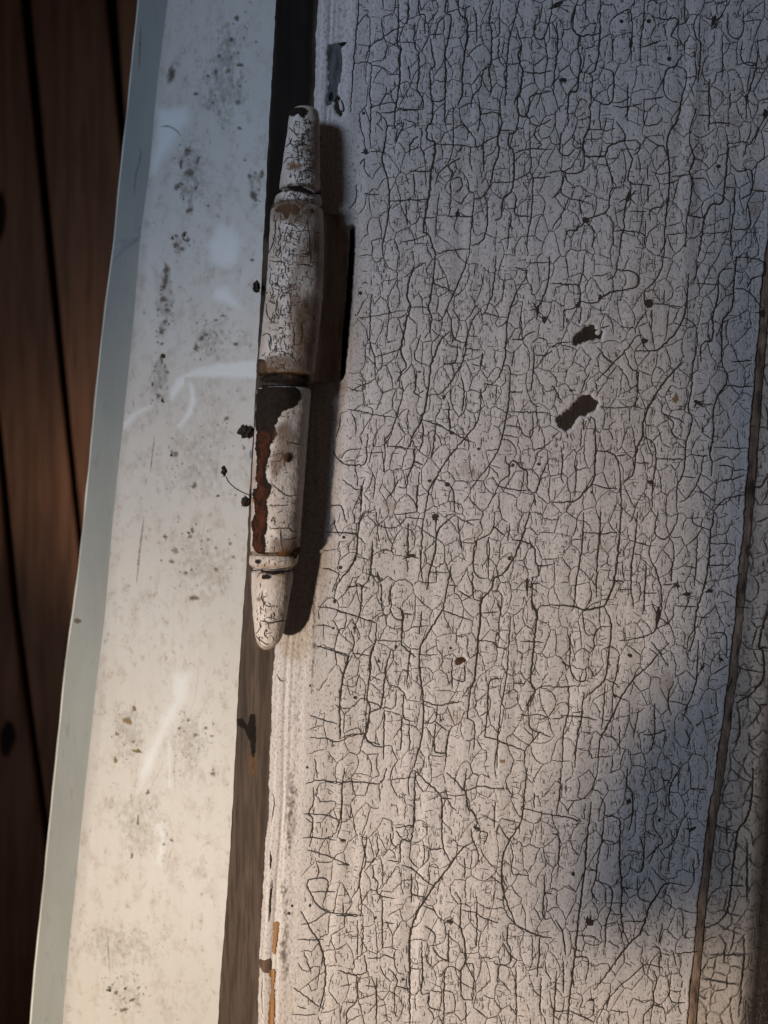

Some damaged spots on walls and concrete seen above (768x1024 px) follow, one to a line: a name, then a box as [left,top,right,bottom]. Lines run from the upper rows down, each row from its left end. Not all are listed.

peeling [325,42,346,116]
crack [261,119,320,387]
peeling [573,326,602,346]
peeling [556,389,598,431]
rust [251,385,301,579]
crack [292,0,768,1024]
peeling [259,905,293,1024]